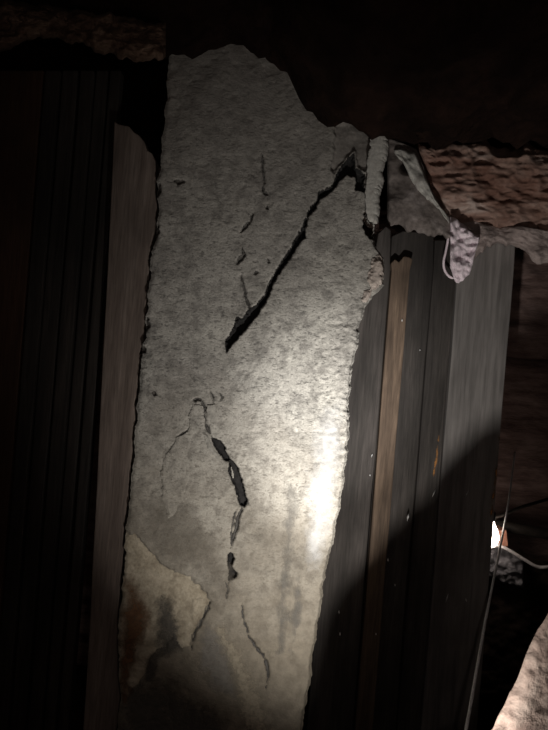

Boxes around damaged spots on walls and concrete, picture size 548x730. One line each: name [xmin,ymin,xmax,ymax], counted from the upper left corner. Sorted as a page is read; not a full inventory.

crack [225,153,366,352]
crack [363,212,373,239]
peeling [442,217,480,283]
peeling [118,532,210,697]
crack [179,392,269,689]